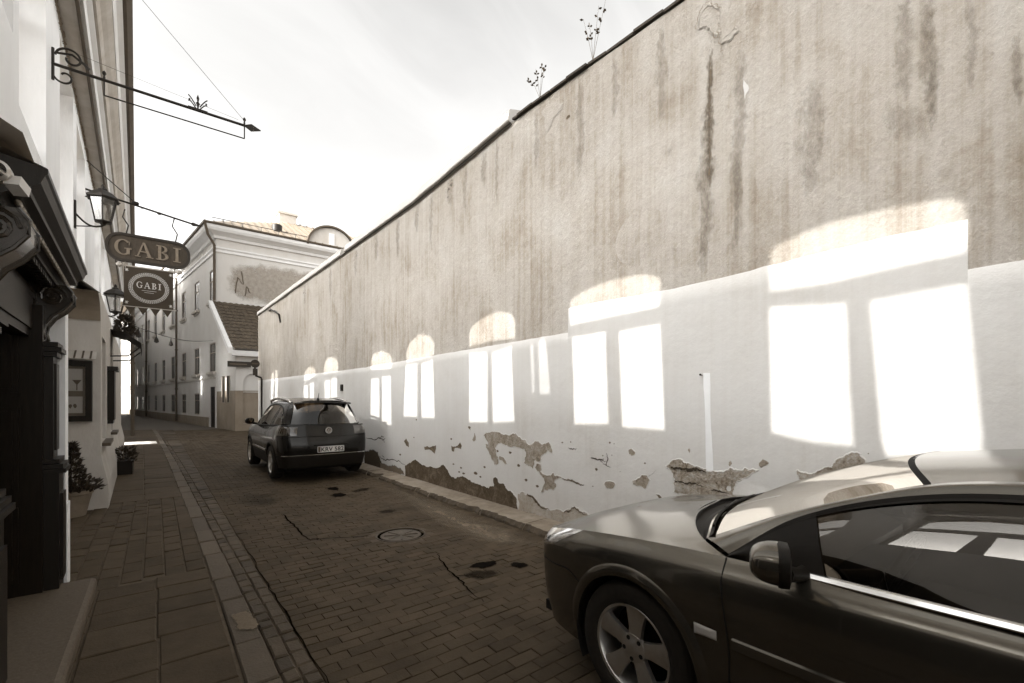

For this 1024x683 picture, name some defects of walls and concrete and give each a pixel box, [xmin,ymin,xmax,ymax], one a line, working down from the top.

flaking render [695,0,739,52]
water stain [698,57,714,218]
peeling [399,426,621,523]
spalling [628,448,769,498]
spalling [795,451,869,480]
crack [437,554,484,602]